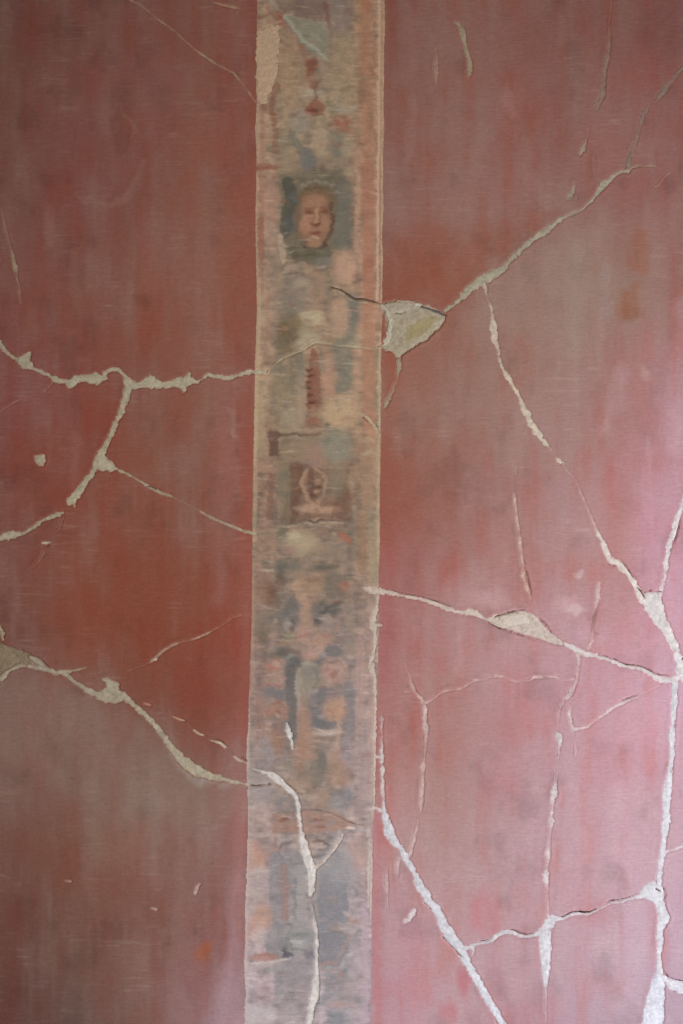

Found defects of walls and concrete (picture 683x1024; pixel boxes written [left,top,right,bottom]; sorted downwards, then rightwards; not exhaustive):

peeling [255,25,280,104]
flaking render [378,300,446,359]
crack [443,0,683,604]
crack [0,339,402,578]
crack [379,465,532,620]
flaking render [486,611,564,645]
crack [45,614,683,1024]